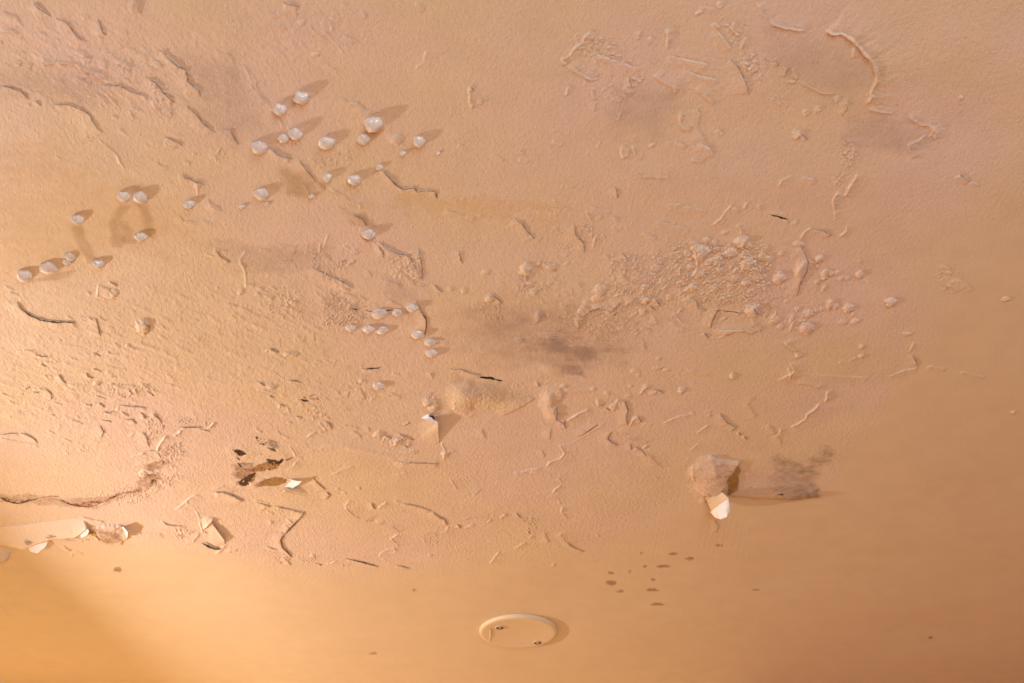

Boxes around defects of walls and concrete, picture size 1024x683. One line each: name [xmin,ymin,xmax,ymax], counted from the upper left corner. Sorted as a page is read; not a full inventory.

peeling [0,343,191,509]
spalling [155,405,432,566]